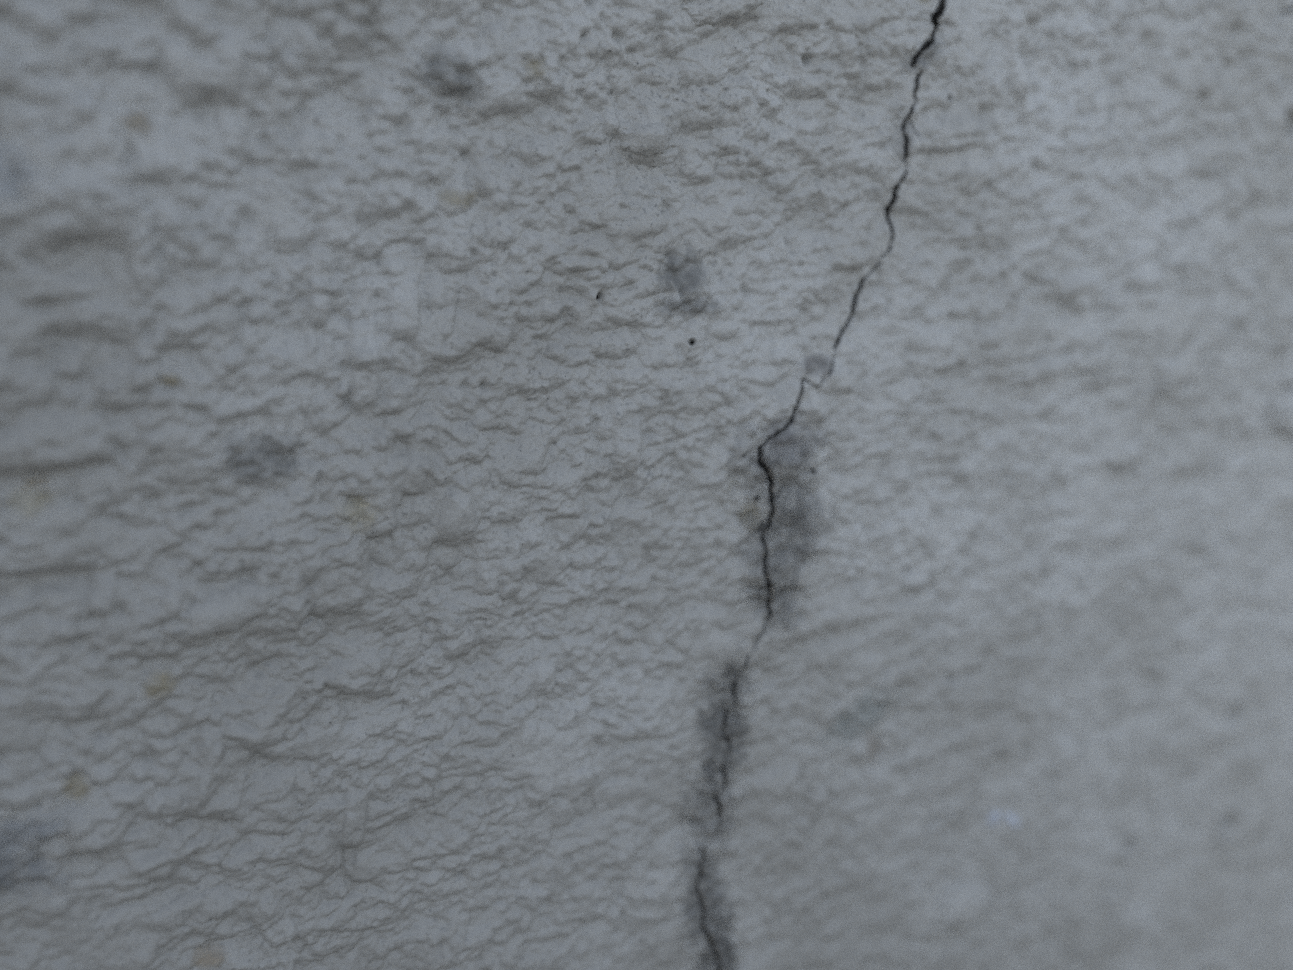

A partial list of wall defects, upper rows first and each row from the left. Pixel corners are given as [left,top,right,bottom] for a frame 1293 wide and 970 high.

crack [696,0,947,970]